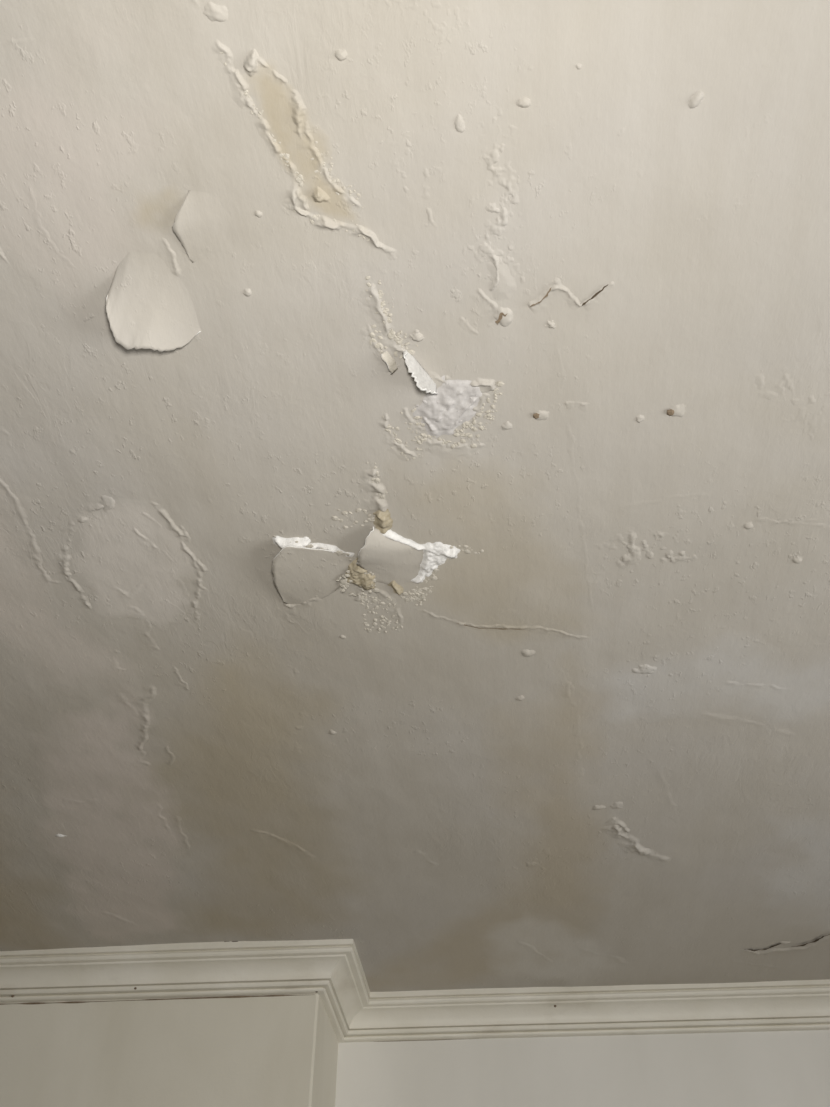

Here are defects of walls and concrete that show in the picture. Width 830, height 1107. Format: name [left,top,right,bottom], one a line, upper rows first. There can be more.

peeling [211,39,398,260]
peeling [106,190,232,352]
spalling [359,276,512,462]
spalling [272,462,484,633]
peeling [592,801,672,869]
crack [740,934,830,958]